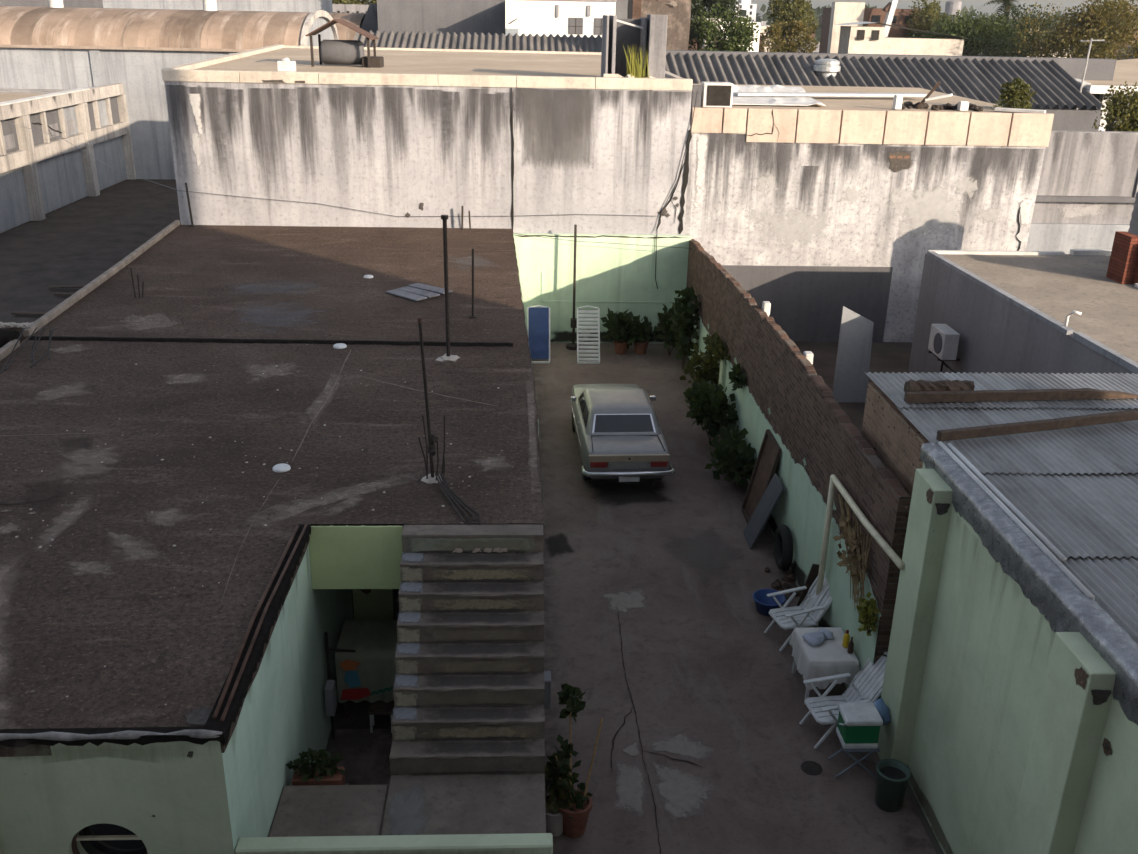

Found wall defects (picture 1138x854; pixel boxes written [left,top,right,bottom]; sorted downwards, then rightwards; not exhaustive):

damp [169,85,689,167]
damp [693,134,1040,208]
spalling [888,151,913,172]
crack [1016,201,1031,251]
spalling [926,489,950,515]
spalling [1074,667,1112,705]
crack [611,612,701,854]
spalling [1102,738,1112,756]